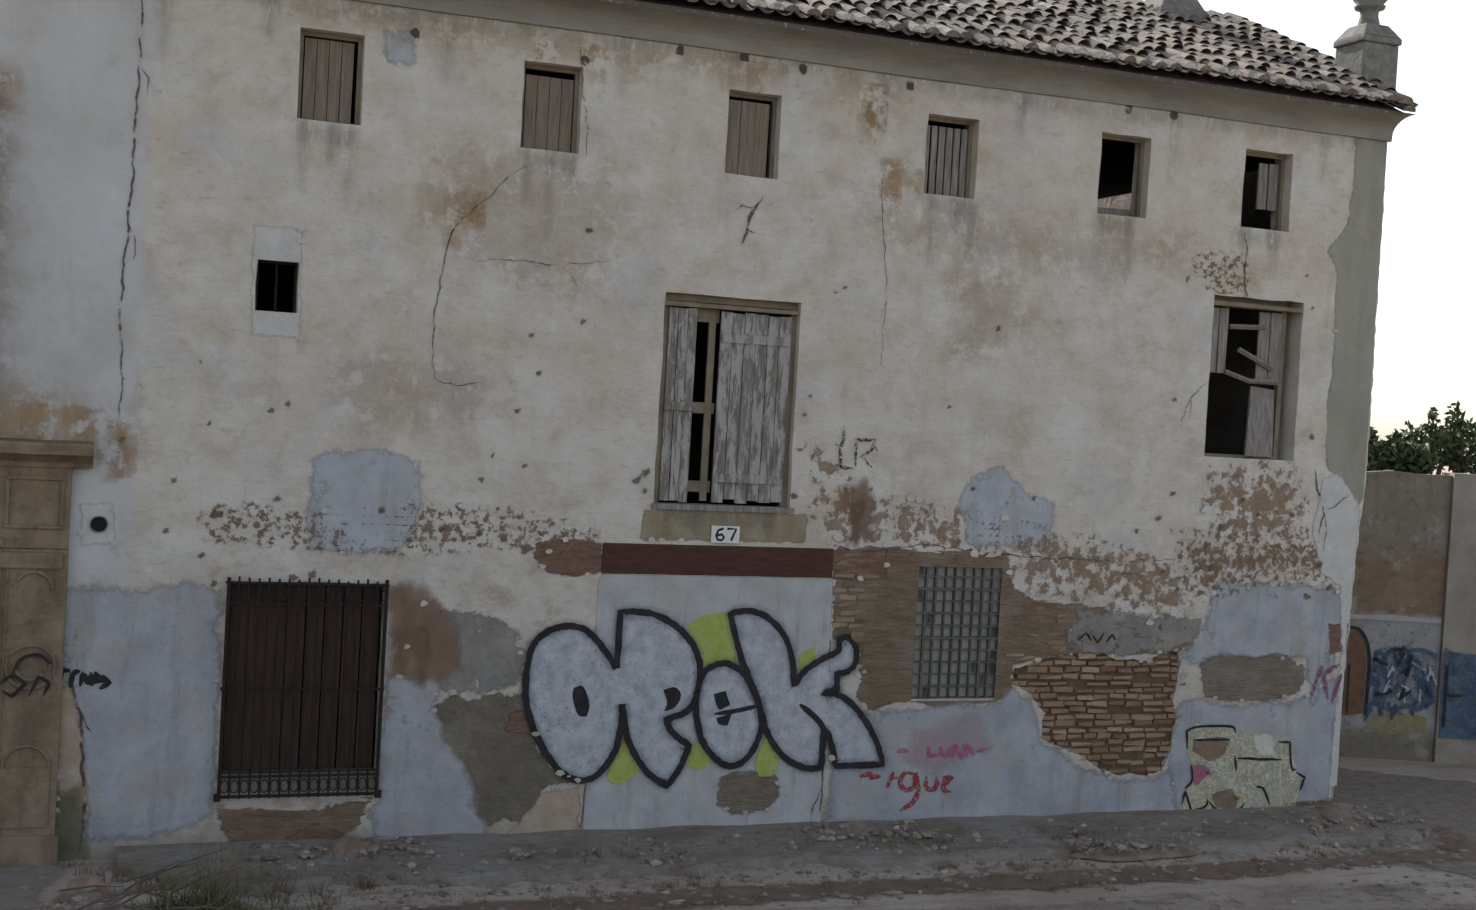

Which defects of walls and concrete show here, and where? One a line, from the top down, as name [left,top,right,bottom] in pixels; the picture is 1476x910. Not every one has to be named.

crack [117,0,149,426]
crack [432,166,527,386]
crack [740,200,761,244]
flaking render [199,496,603,577]
spalling [632,445,1341,785]
spalling [431,689,581,826]